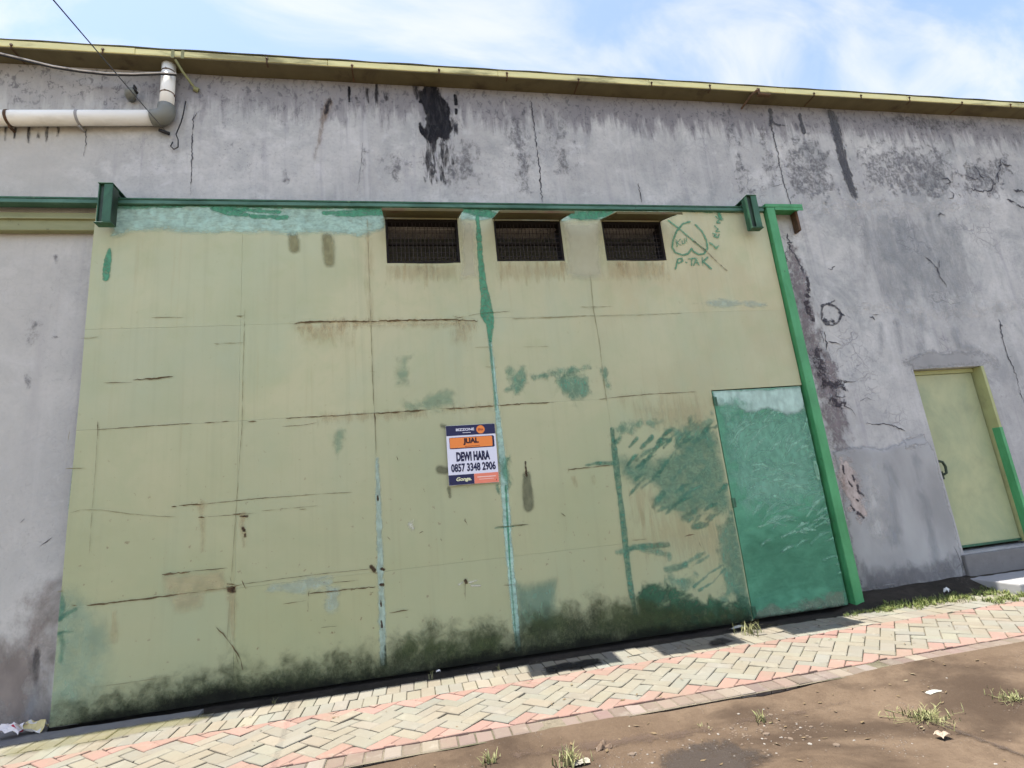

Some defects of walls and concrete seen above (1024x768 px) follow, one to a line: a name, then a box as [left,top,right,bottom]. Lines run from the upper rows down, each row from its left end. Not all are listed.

crack [189,113,197,190]
damp [413,86,458,184]
crack [530,101,543,198]
crack [771,126,791,204]
damp [792,109,860,198]
flaking render [788,245,867,519]
damp [821,300,845,326]
crack [820,332,905,431]
crack [999,320,1022,397]
rust [73,383,376,669]
damp [0,602,56,725]